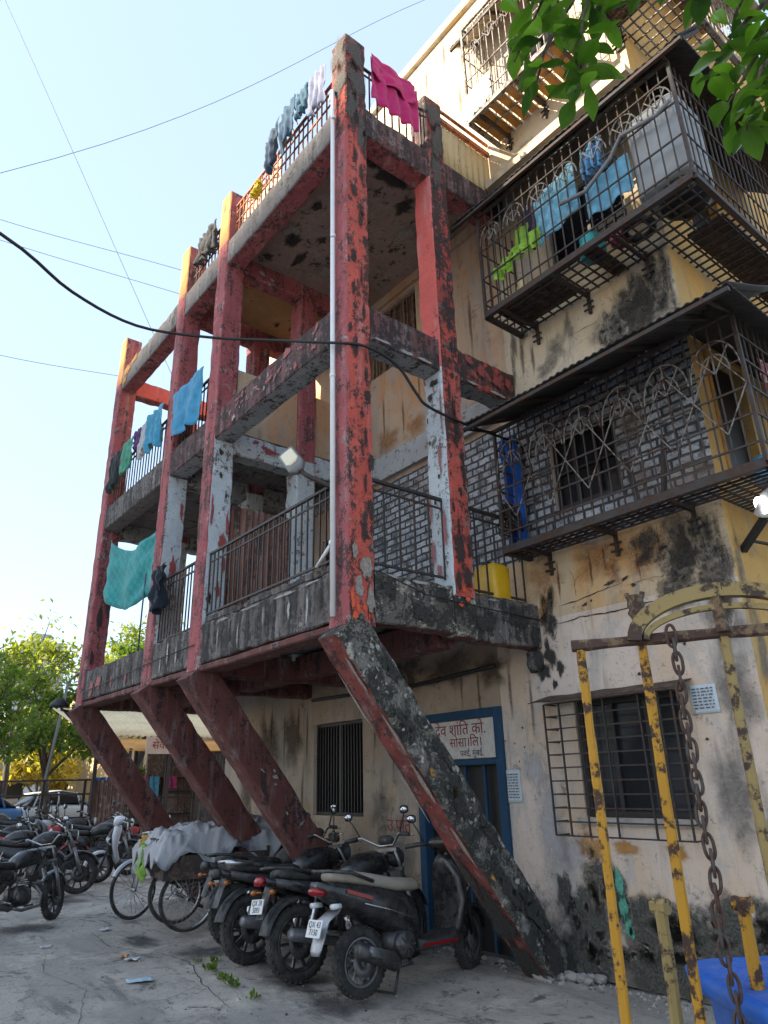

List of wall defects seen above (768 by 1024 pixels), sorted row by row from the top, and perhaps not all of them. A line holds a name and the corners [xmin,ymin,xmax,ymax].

mould [366,158,413,215]
mould [285,234,307,267]
peeling [347,110,368,357]
damp [594,253,676,346]
peeling [210,493,230,571]
spalling [351,369,376,619]
damp [630,513,745,598]
damp [412,587,449,623]
peeling [338,658,378,737]
peeling [382,715,435,823]
peeling [450,827,477,868]